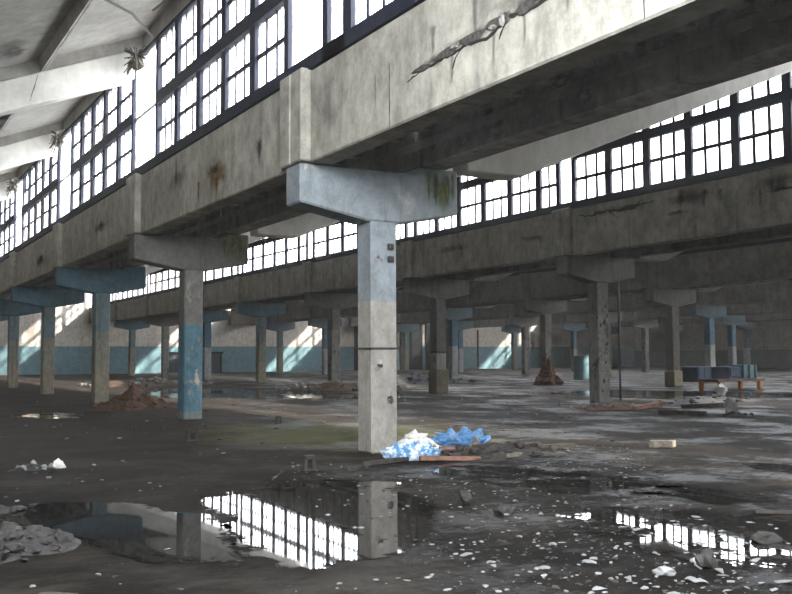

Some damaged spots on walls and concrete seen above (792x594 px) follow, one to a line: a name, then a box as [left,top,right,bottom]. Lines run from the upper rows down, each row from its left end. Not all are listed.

crack [389,0,548,127]